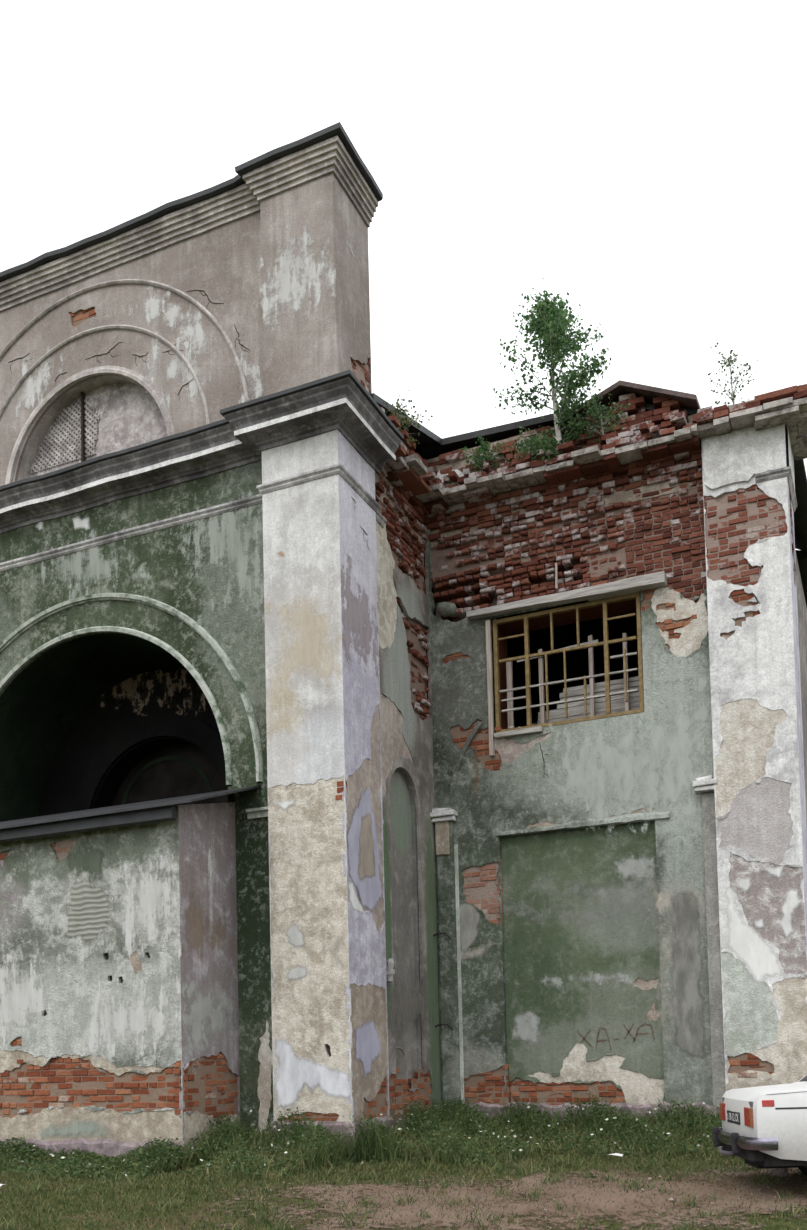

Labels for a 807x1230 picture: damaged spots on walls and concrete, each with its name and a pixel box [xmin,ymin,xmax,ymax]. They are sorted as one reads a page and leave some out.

flaking render [69,308,96,326]
crack [187,288,252,352]
crack [8,340,199,400]
peeling [73,517,89,529]
flaking render [257,458,807,1135]
flaking render [51,838,77,861]
flaking render [110,951,150,983]
flaking render [0,1037,240,1150]